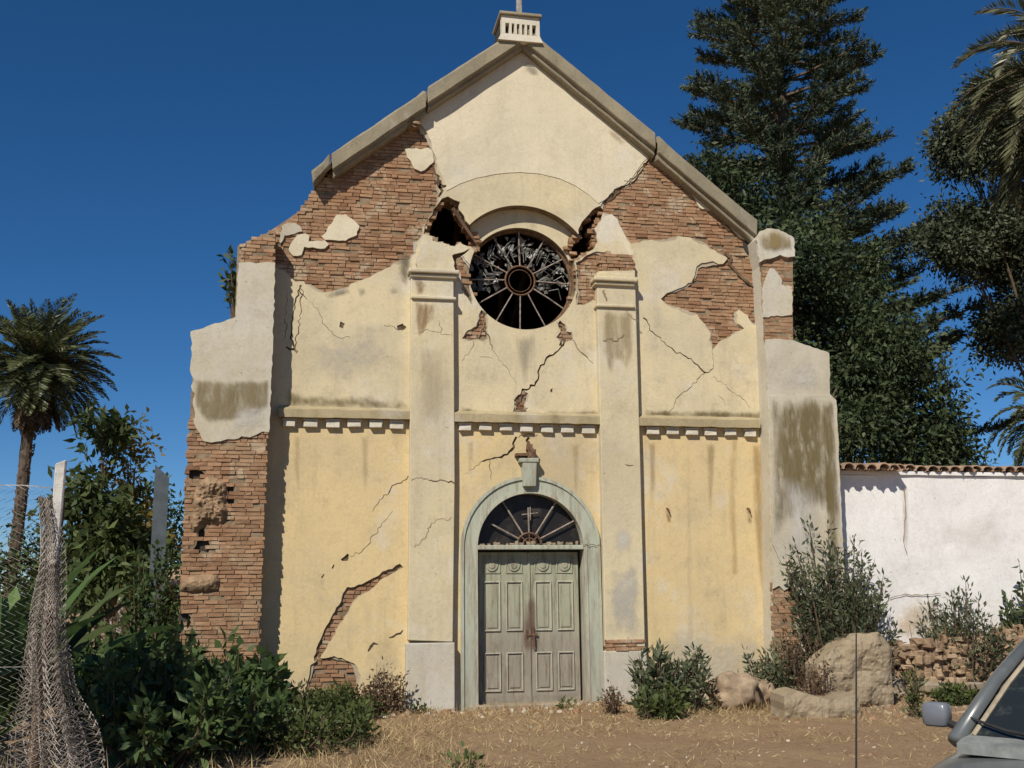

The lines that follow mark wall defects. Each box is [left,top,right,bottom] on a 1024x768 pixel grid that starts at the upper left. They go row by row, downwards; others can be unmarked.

flaking render [239,129,482,297]
crack [602,160,650,205]
flaking render [563,159,794,347]
crack [283,286,347,353]
flaking render [464,314,487,341]
damp [606,314,630,364]
crack [321,290,744,578]
flaking render [178,418,268,663]
damp [791,491,809,549]
flaking render [308,566,403,699]
flaking render [770,582,800,667]